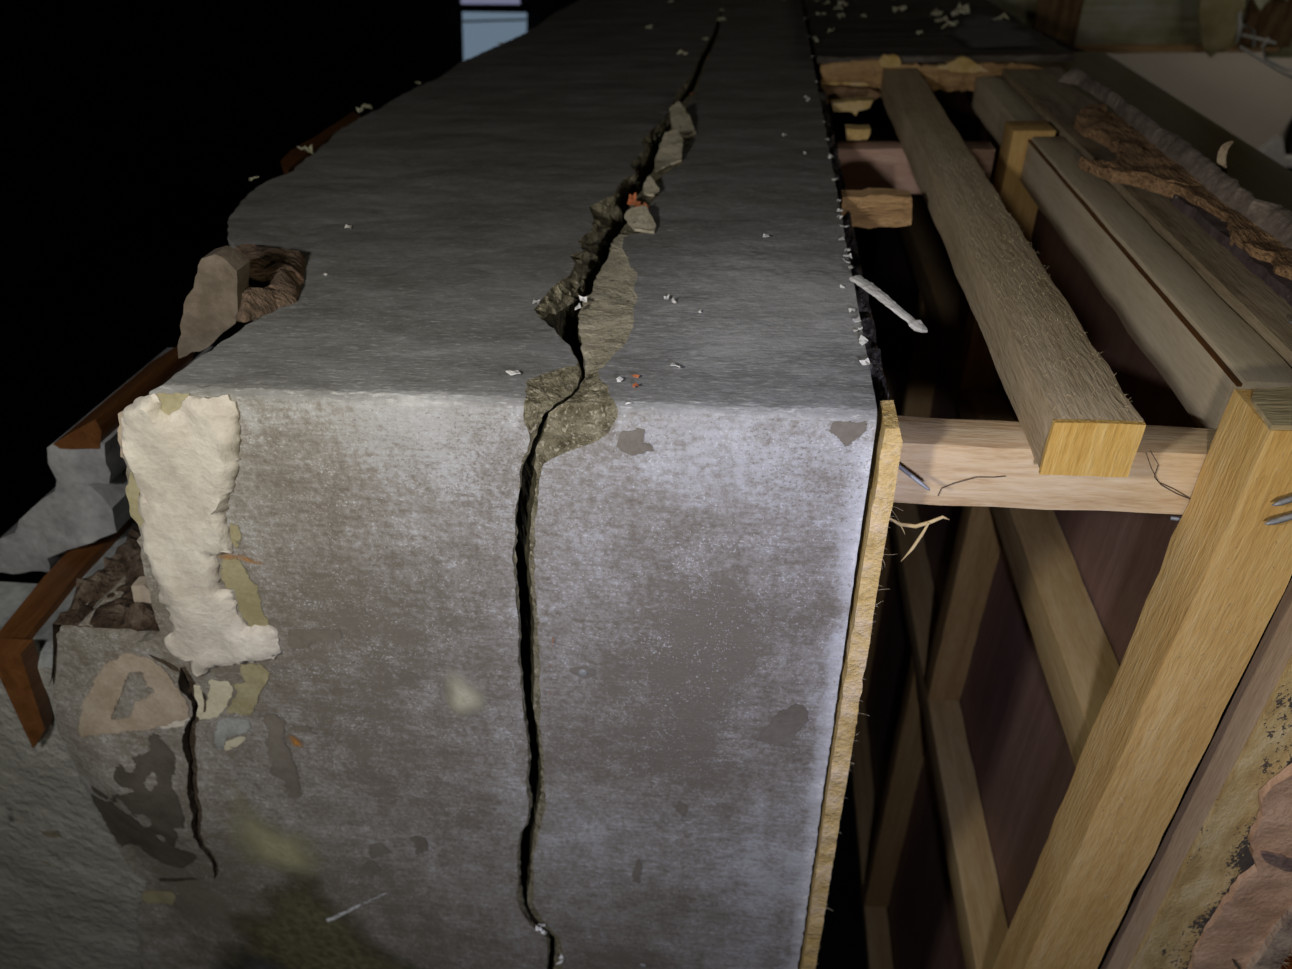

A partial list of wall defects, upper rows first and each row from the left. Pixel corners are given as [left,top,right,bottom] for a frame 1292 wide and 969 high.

crack [149,655,219,882]
peeling [76,393,342,868]
flaking render [235,243,305,323]
crack [512,14,721,969]